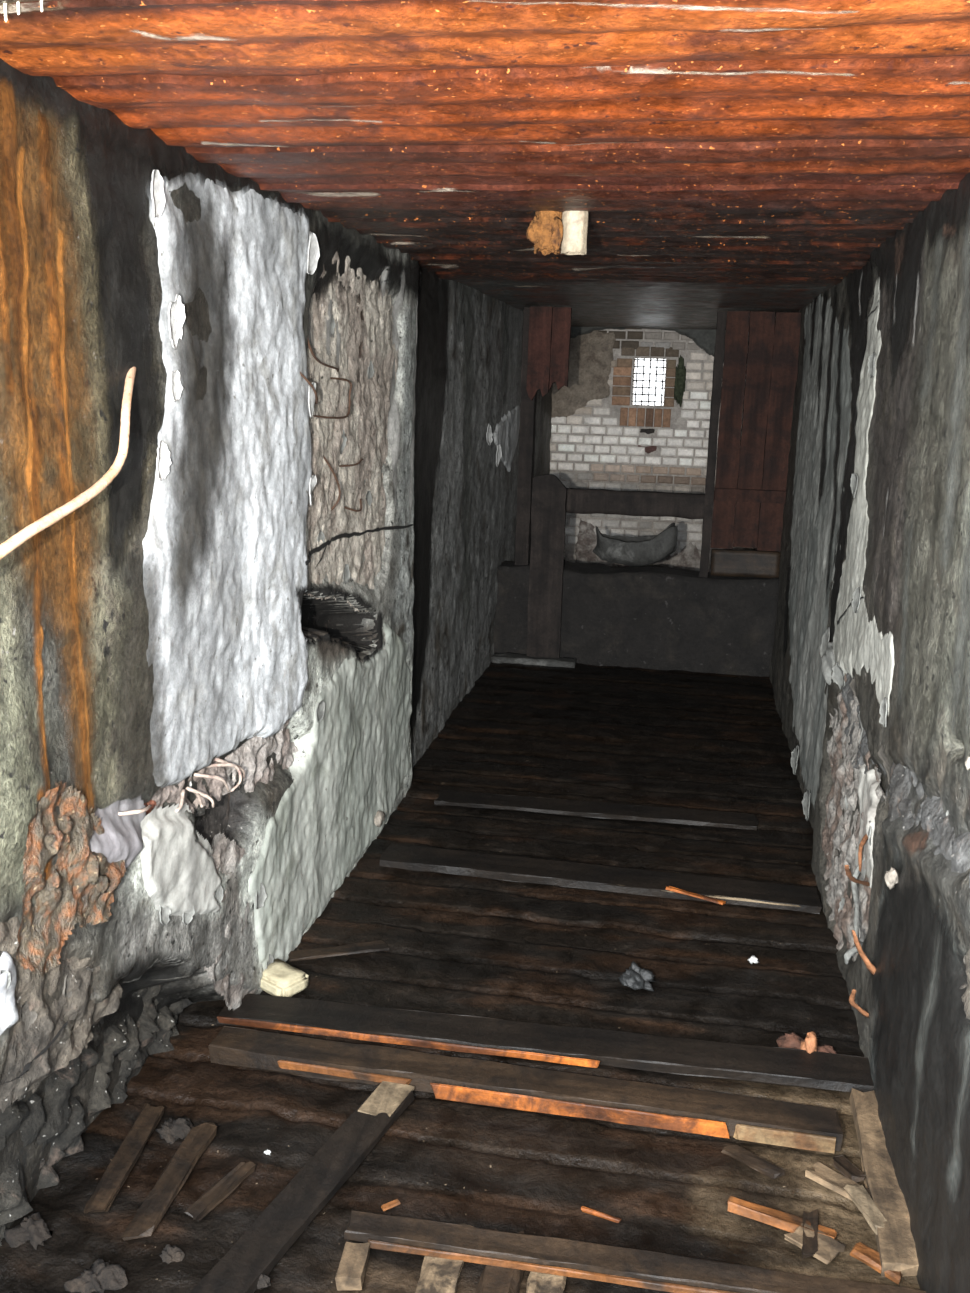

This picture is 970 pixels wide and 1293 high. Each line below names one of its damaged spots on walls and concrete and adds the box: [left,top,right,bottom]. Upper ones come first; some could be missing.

corrosion [0,83,126,979]
spalling [0,367,136,560]
peeling [140,170,399,1011]
crack [305,524,413,569]
spalling [638,429,657,454]
peeling [788,277,970,962]
spalling [0,916,123,1113]
water stain [872,869,970,1293]